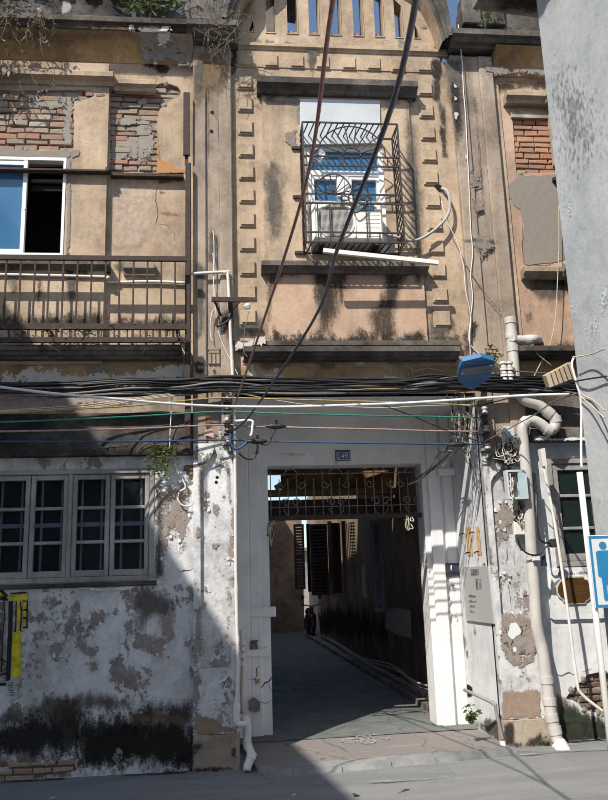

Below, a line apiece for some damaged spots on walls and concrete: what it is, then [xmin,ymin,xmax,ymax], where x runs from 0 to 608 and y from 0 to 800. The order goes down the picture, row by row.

peeling [128,25,196,66]
flaking render [0,81,185,174]
water stain [432,59,476,156]
water stain [263,161,282,237]
water stain [0,313,101,323]
water stain [66,271,87,299]
water stain [273,275,478,356]
peeling [0,364,185,411]
peeling [156,465,201,566]
peeling [499,609,536,669]
flaking render [566,671,608,717]
water stain [0,695,237,783]